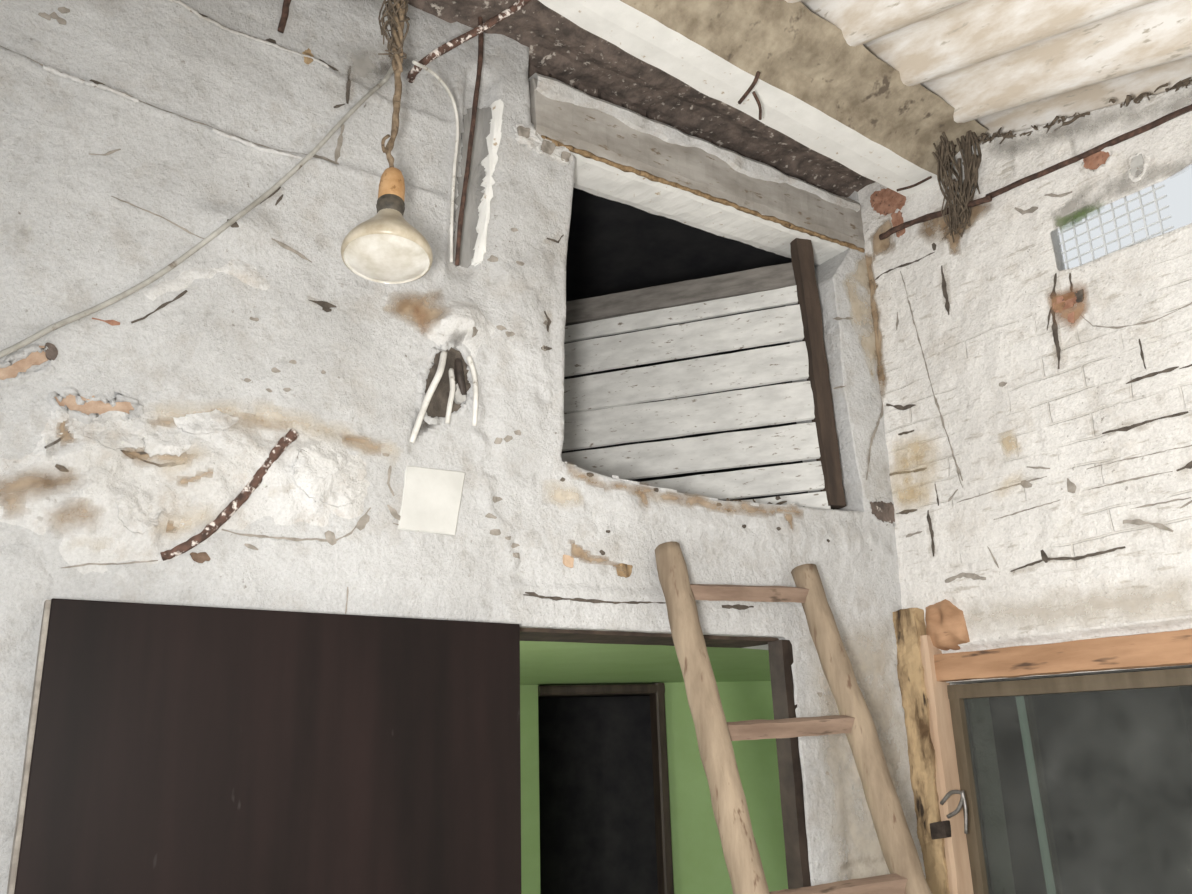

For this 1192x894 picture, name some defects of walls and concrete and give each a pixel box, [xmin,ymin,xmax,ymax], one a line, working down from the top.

spalling [1052,289,1084,323]
spalling [0,342,61,388]
spalling [47,387,144,435]
crack [866,243,1192,583]
spalling [190,552,211,563]
spalling [616,563,633,578]